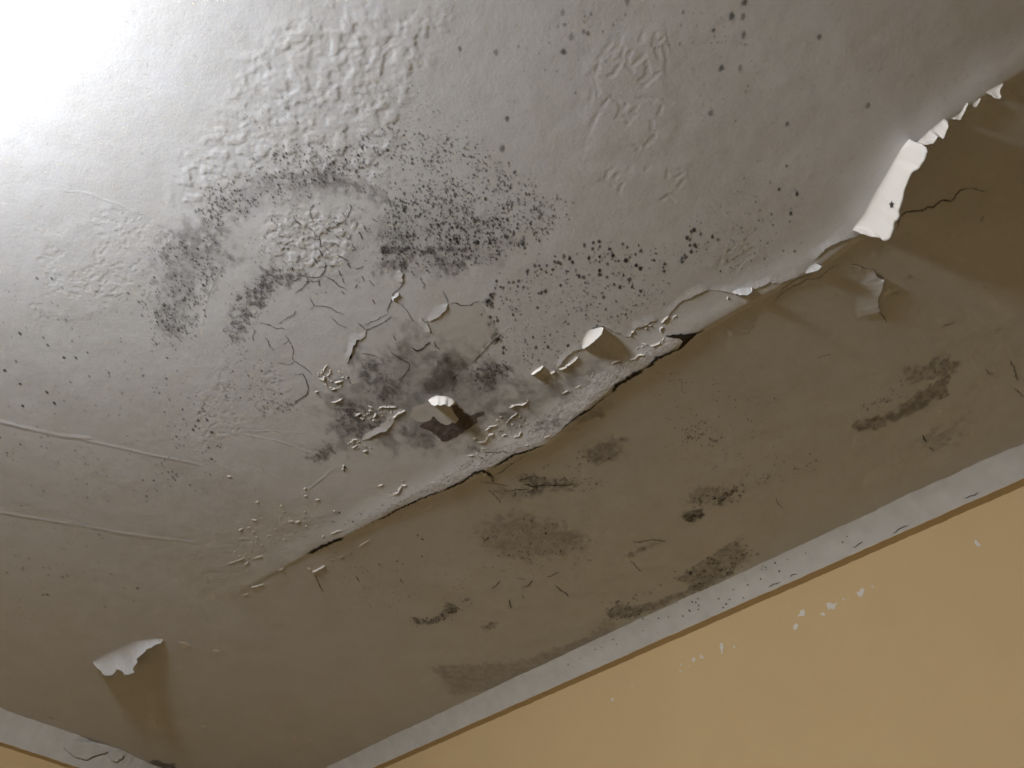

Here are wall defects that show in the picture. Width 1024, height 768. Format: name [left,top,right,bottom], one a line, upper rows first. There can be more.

leakage [195,122,669,365]
peeling [531,83,1003,394]
crack [898,190,961,225]
crack [252,193,478,407]
peeling [391,270,403,302]
peeling [315,331,366,403]
peeling [416,302,509,371]
spalling [345,395,529,456]
peeling [93,638,163,677]